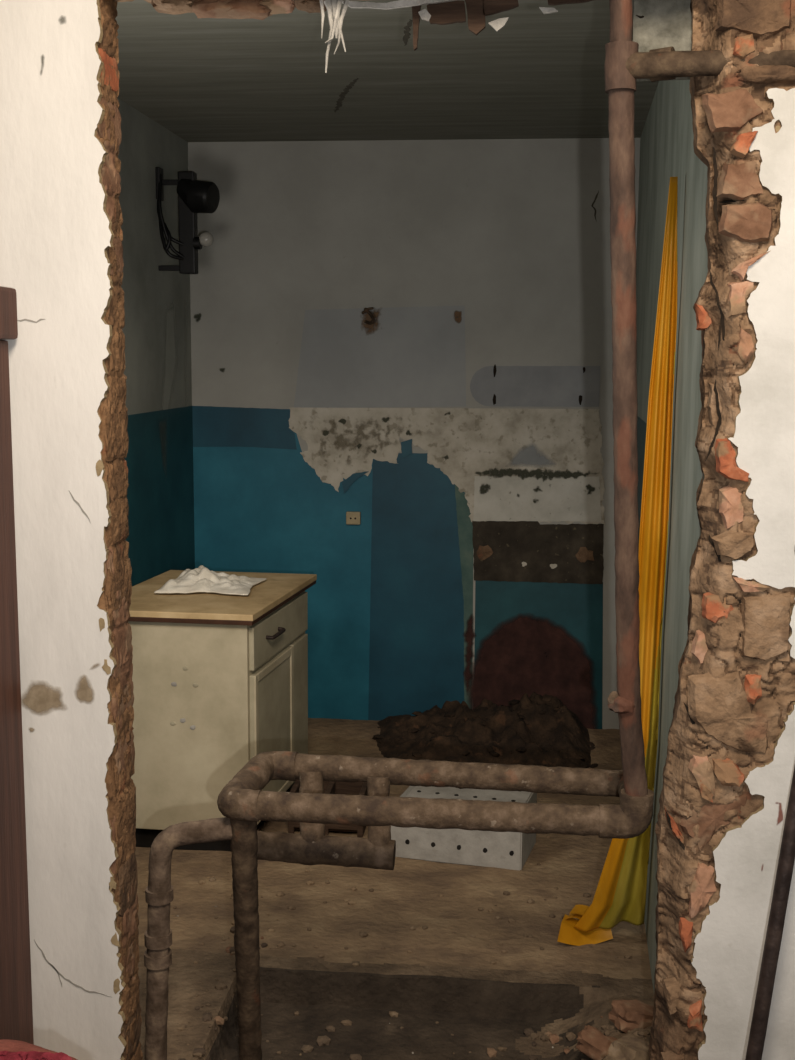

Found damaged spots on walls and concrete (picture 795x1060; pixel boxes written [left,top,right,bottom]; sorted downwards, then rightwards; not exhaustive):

spalling [539,0,593,14]
flaking render [96,0,519,1060]
peeling [289,407,605,584]
flaking render [576,0,795,1060]
crack [34,939,111,997]